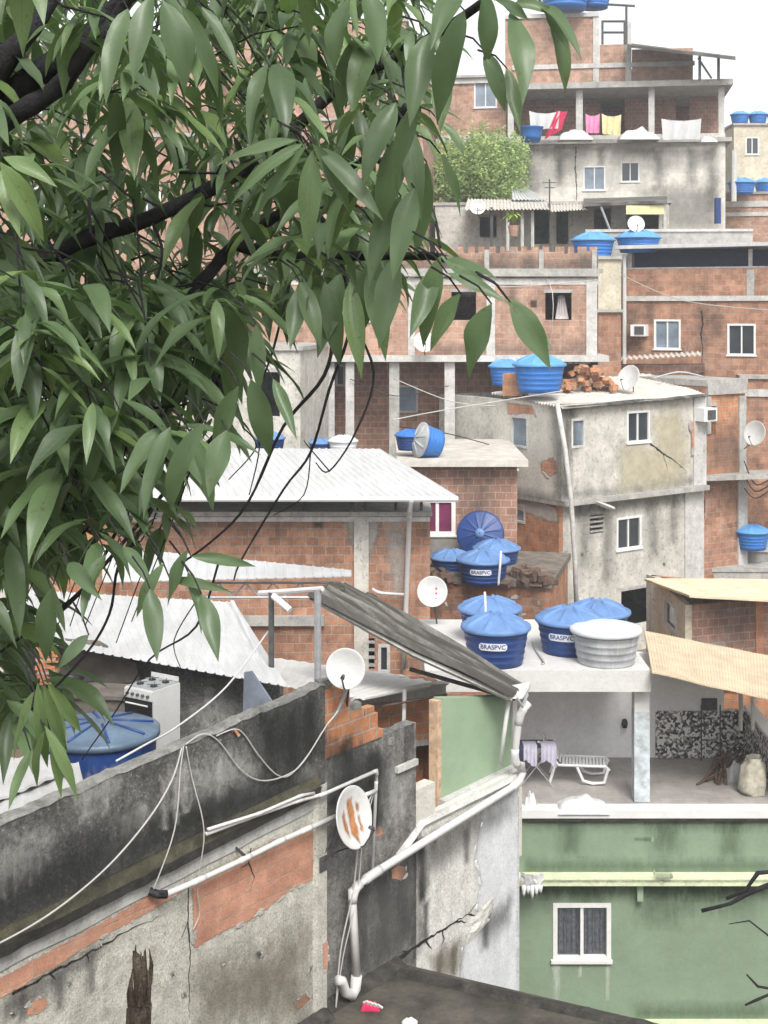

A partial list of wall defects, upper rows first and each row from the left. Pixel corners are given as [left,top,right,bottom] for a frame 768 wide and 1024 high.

spalling [540,454,557,479]
crack [650,443,686,471]
damp [0,779,304,915]
spalling [0,823,313,998]
crack [181,888,191,1017]
damp [329,747,383,819]
crack [399,903,477,959]
peeling [460,788,519,991]